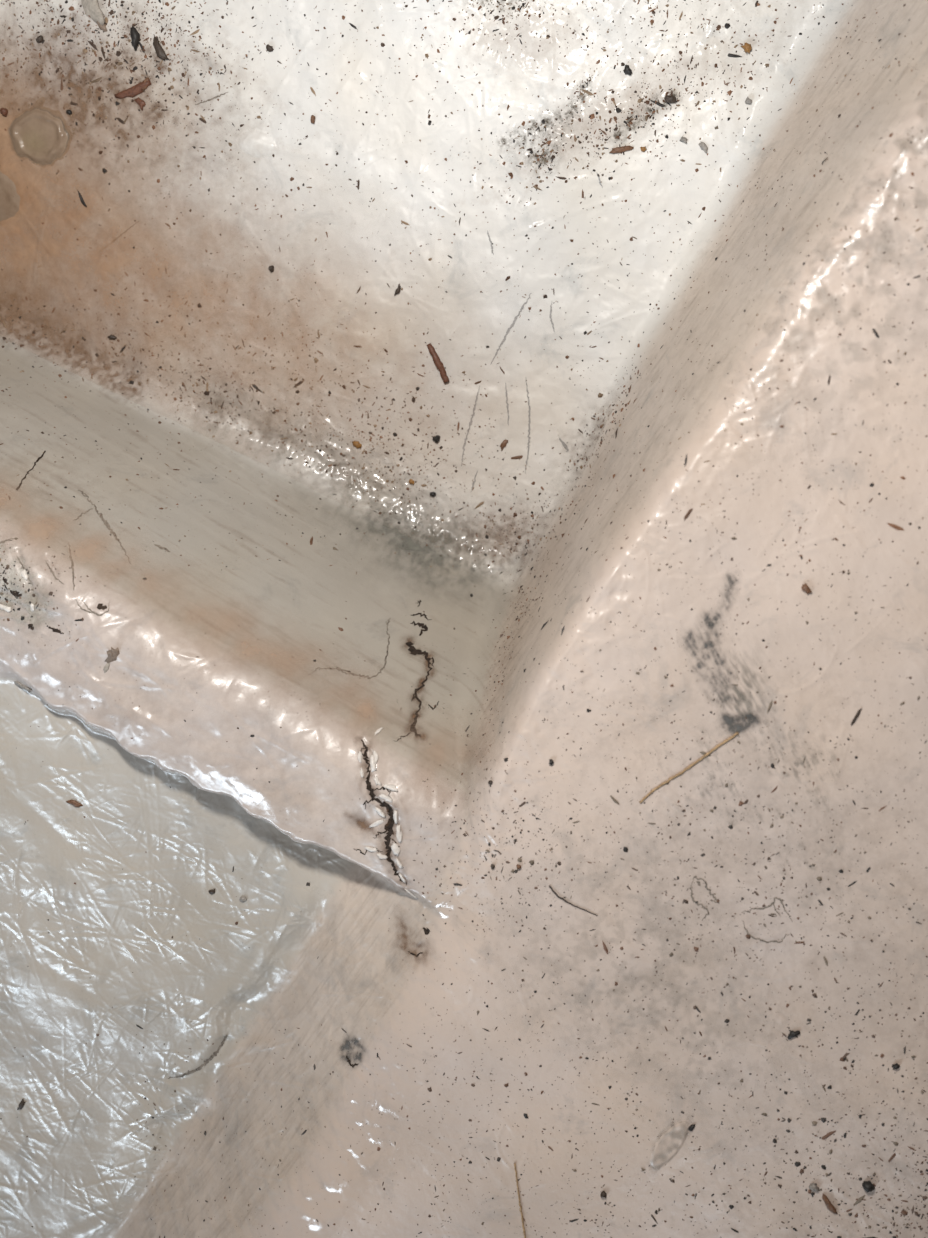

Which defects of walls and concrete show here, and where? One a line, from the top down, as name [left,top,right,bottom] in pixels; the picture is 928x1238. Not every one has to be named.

crack [308,600,439,899]